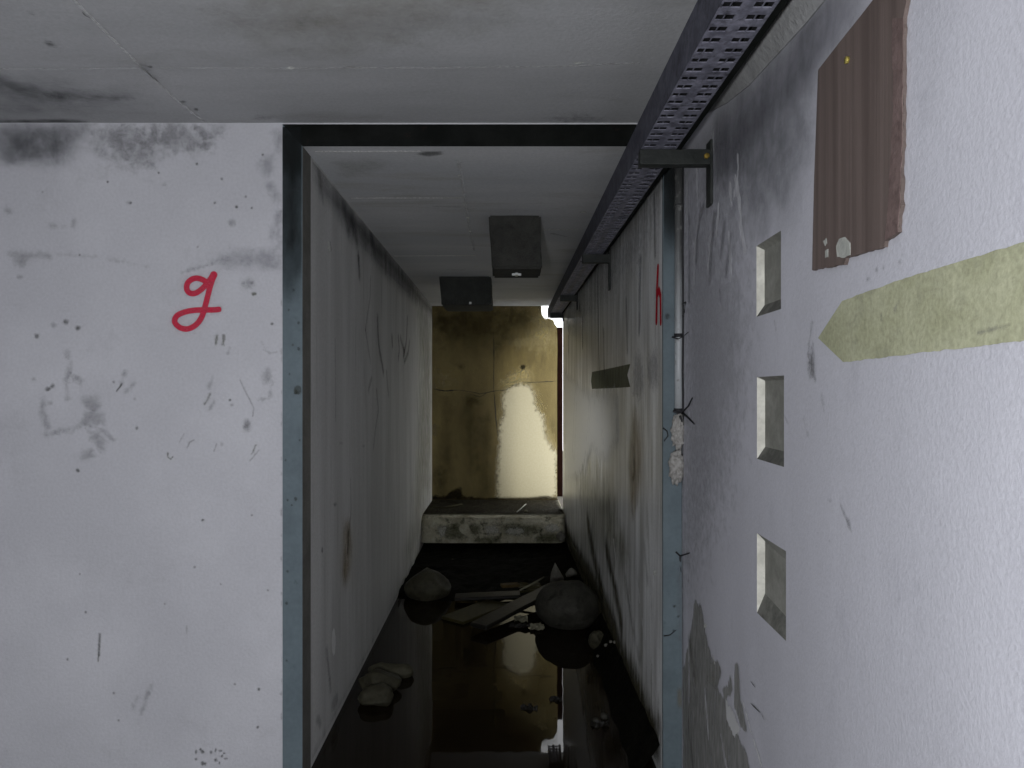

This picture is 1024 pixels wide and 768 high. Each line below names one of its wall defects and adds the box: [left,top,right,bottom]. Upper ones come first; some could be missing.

crack [435,332,553,435]
peeling [683,601,749,768]